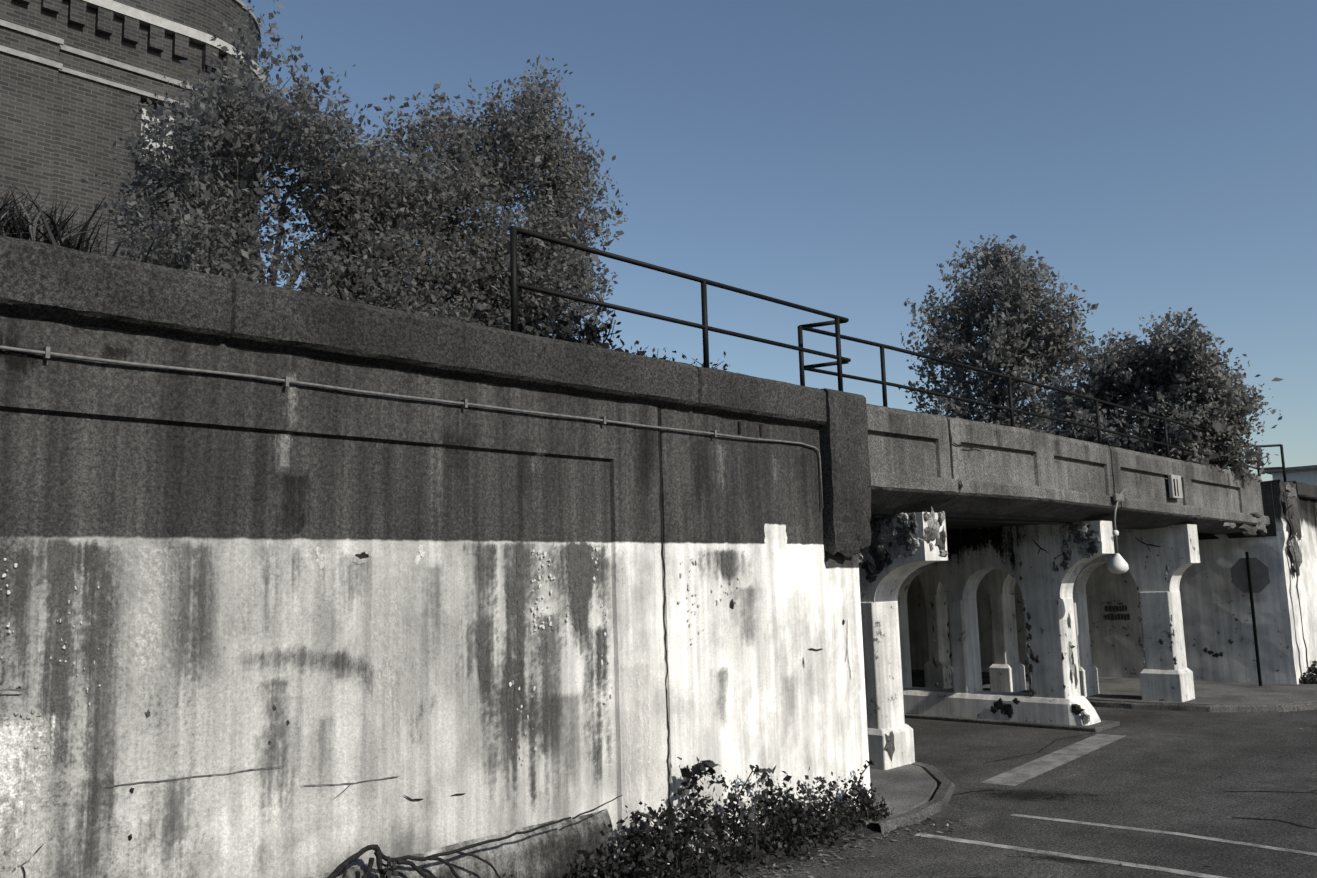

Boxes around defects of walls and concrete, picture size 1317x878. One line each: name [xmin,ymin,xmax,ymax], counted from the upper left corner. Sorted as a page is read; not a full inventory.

water stain [700,549,745,583]
spalling [858,506,948,583]
spalling [1053,522,1101,572]
water stain [173,546,217,678]
water stain [745,587,755,637]
water stain [0,539,120,878]
water stain [464,541,616,801]
spalling [991,602,1040,719]
water stain [150,780,189,857]